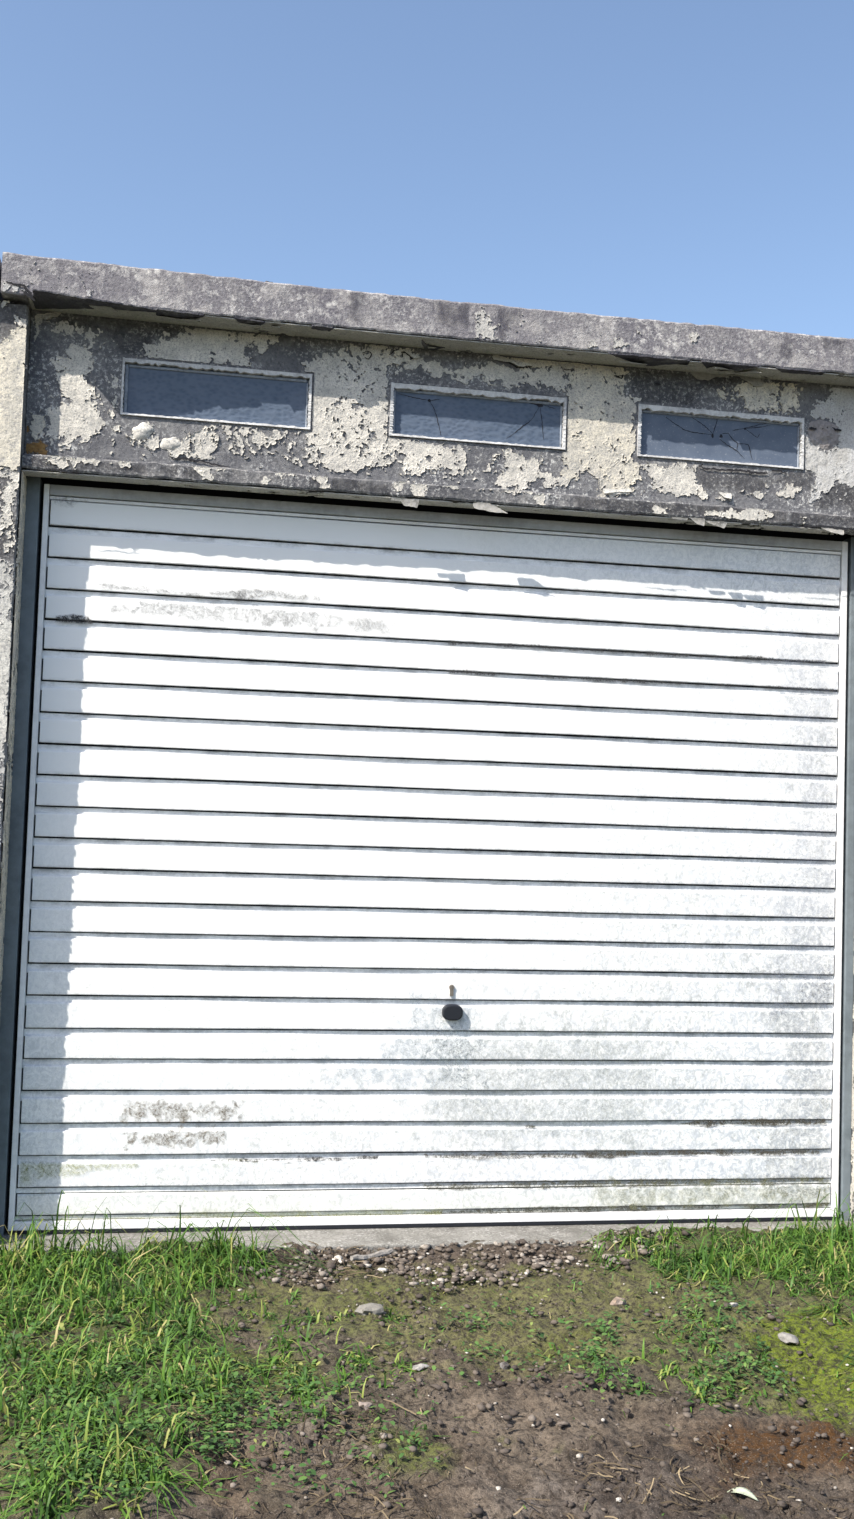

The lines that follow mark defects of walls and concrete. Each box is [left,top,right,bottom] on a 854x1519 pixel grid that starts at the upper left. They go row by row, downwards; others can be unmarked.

rust [26,426,48,455]
peeling [0,261,854,1017]